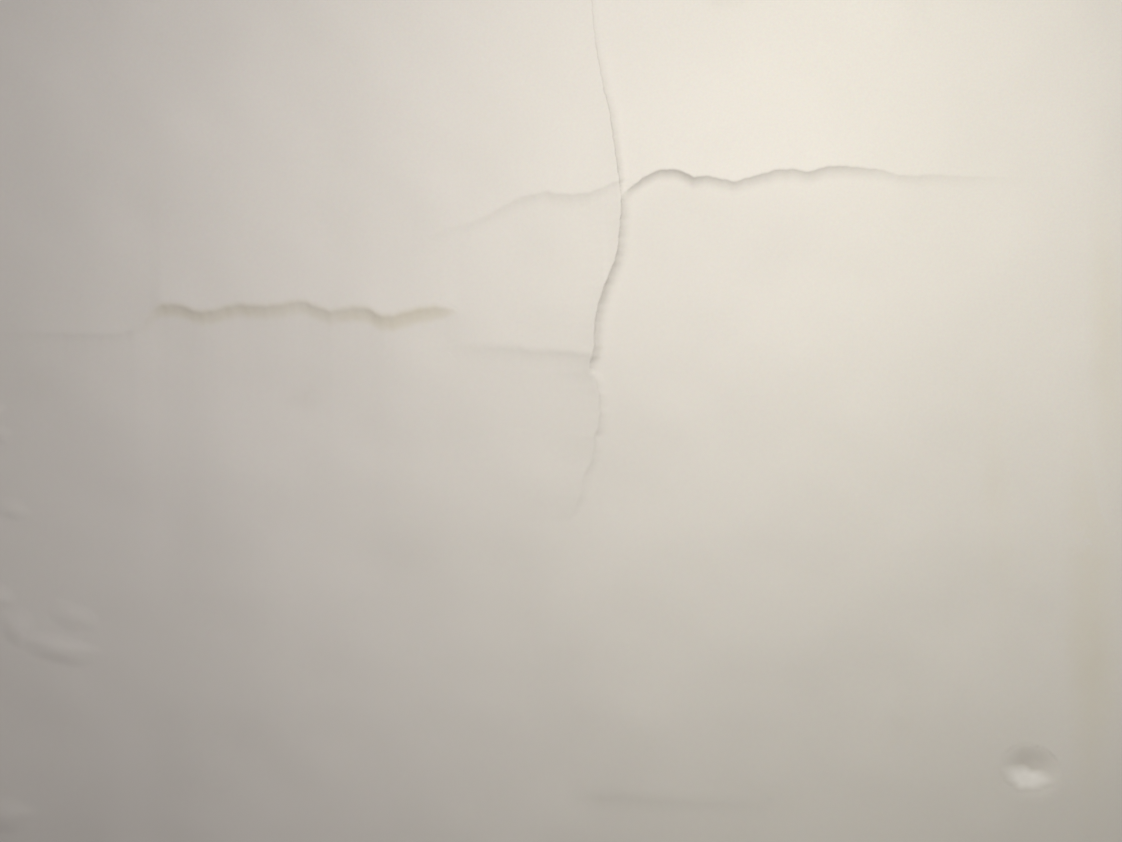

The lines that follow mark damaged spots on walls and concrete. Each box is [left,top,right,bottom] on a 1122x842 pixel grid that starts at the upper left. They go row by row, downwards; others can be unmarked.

crack [4,0,1024,518]